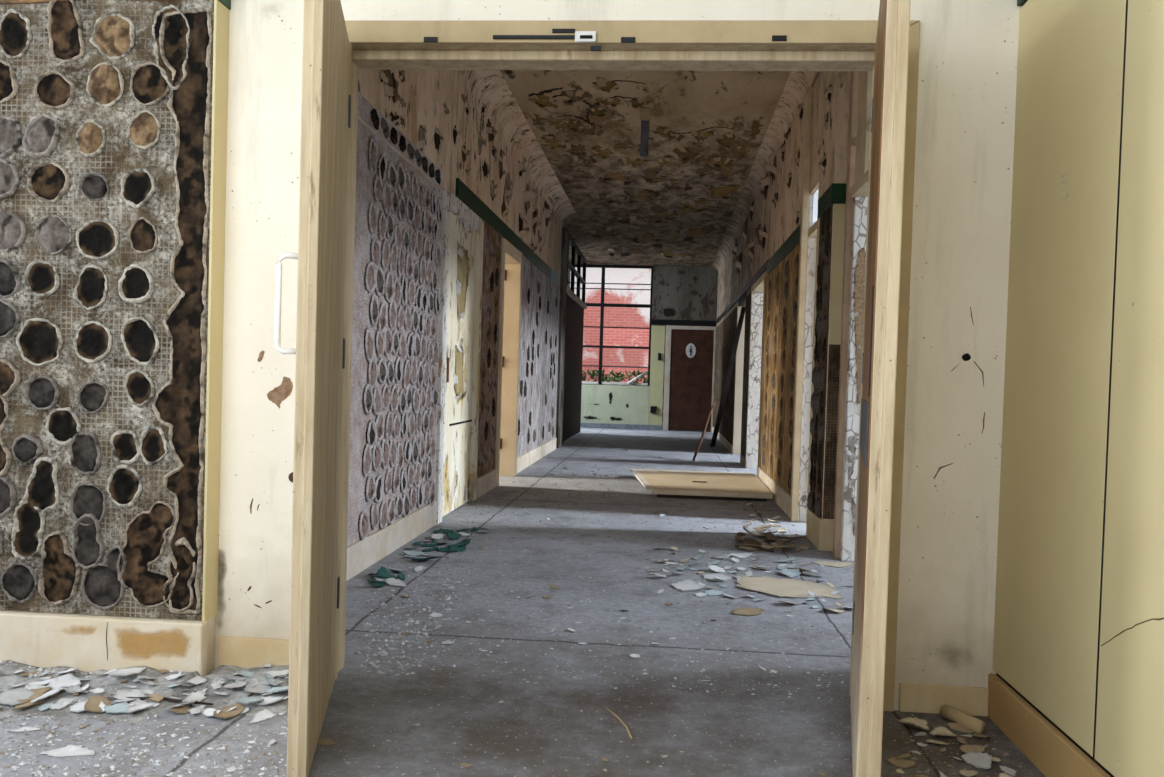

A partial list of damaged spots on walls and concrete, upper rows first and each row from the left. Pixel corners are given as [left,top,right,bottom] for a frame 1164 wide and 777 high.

peeling [529,81,804,275]
peeling [267,376,293,409]
crack [1101,618,1164,646]